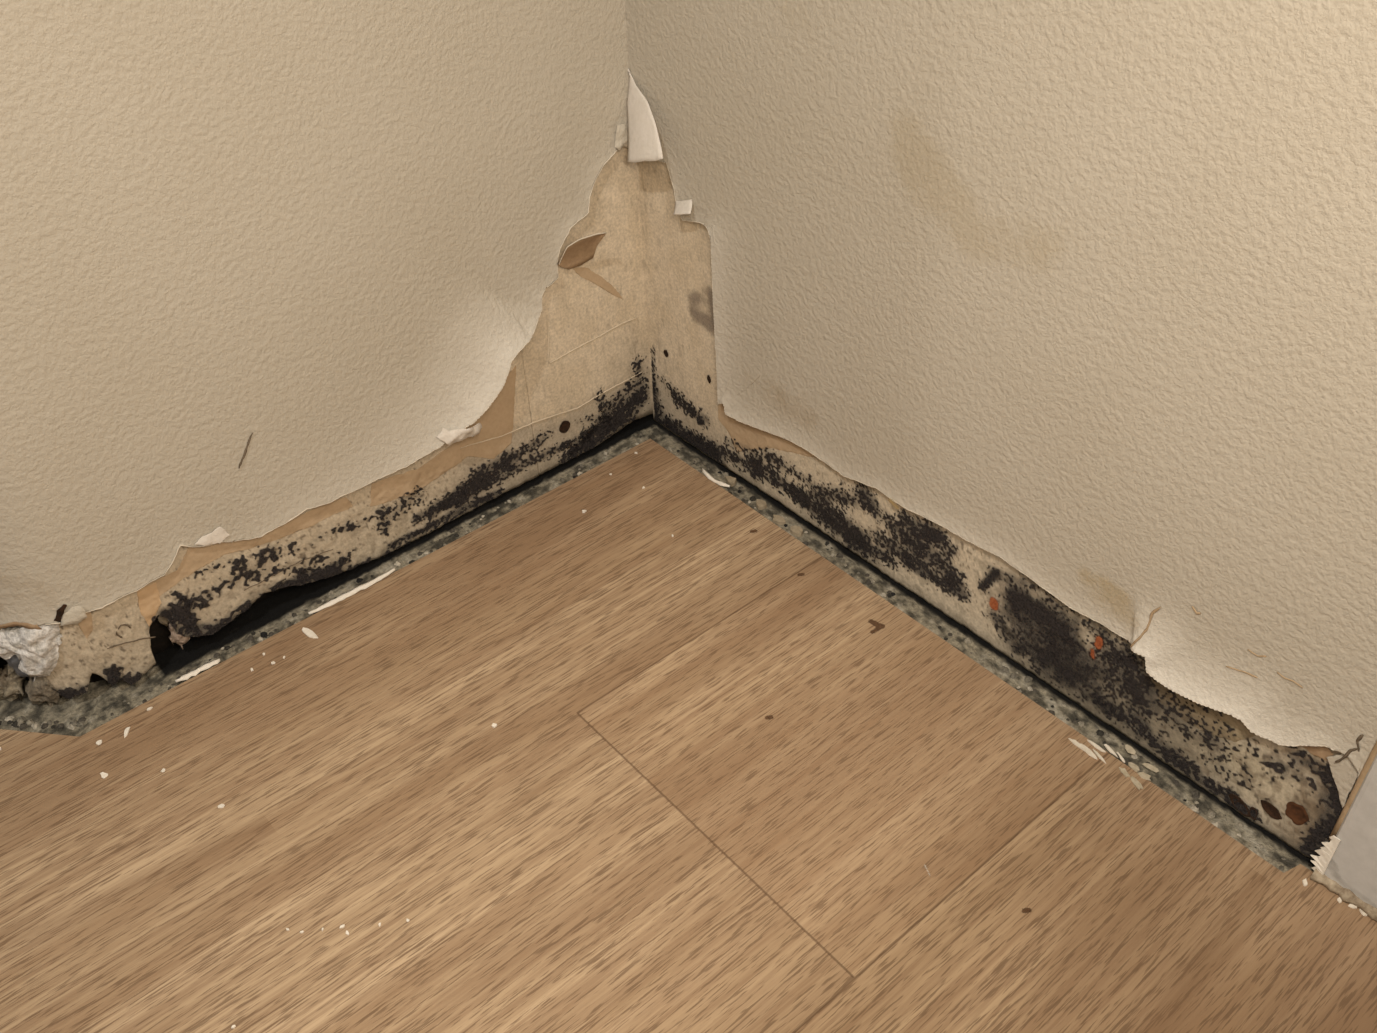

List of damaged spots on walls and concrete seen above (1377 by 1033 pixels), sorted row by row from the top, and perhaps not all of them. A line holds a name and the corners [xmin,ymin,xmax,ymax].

peeling [0,68,1358,887]
damp [151,346,1349,861]